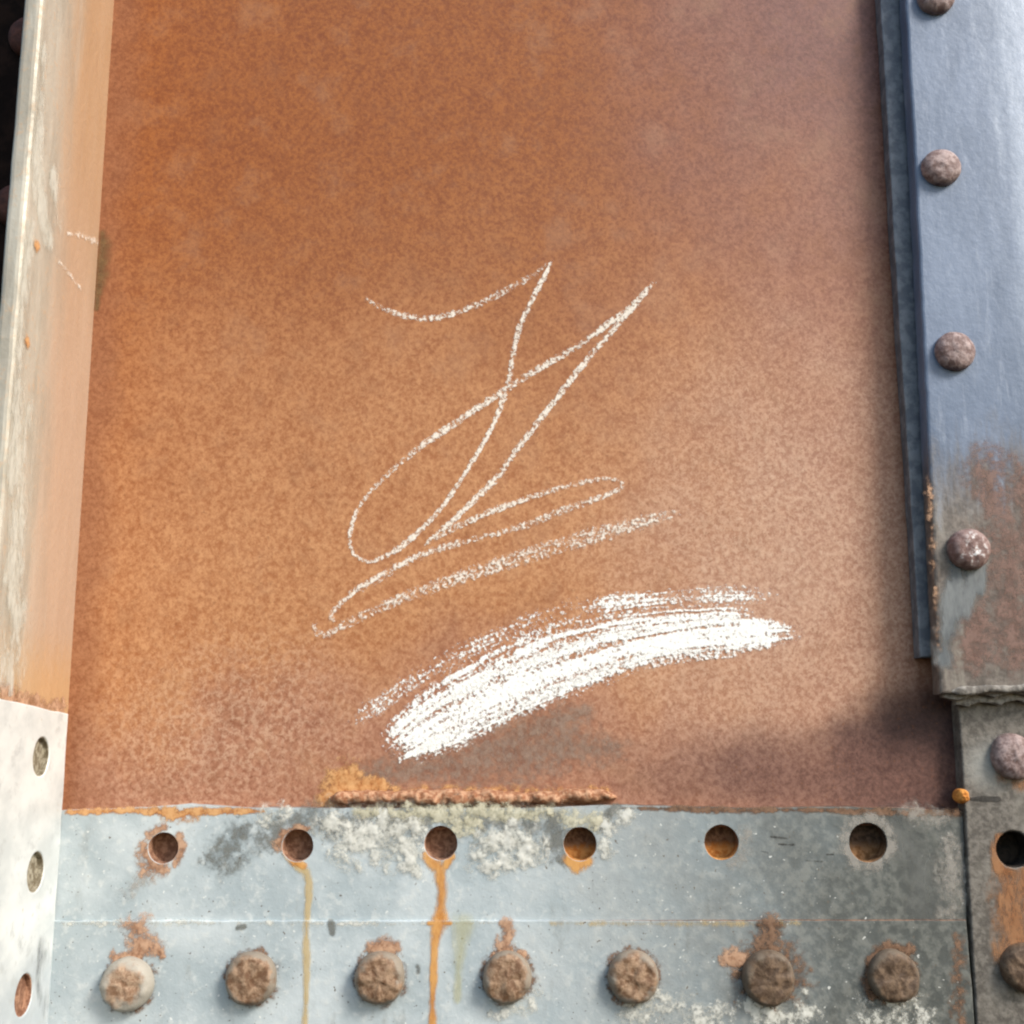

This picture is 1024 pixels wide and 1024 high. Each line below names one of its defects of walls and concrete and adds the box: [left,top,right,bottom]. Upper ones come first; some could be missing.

corrosion [316,763,428,807]
corrosion [66,805,265,878]
efflorescence [206,800,636,879]
corrosion [103,912,166,973]
corrosion [272,824,312,1024]
corrosion [423,851,455,1024]
corrosion [480,917,536,993]
corrosion [718,912,813,1000]
corrosion [991,834,1024,960]